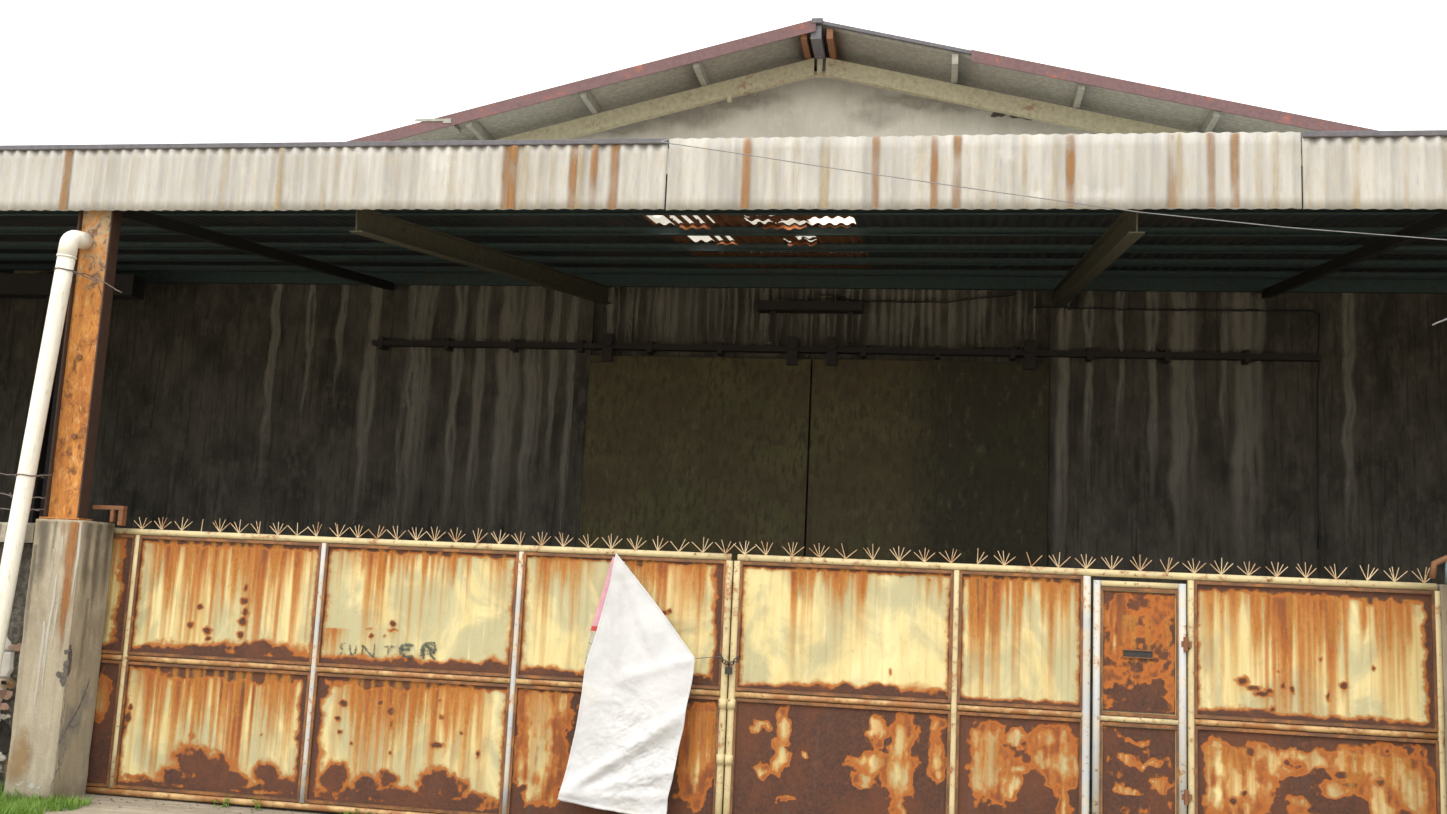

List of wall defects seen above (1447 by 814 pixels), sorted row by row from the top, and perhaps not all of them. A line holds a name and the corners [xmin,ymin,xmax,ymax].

rust [569,145,619,209]
rust [930,142,938,208]
damp [446,286,579,502]
damp [799,289,987,341]
damp [1056,291,1094,517]
damp [1146,291,1197,511]
damp [1219,292,1263,527]
crack [50,679,90,793]
rust [87,537,724,814]
rust [732,565,1081,814]
rust [1102,591,1175,814]
rust [1197,584,1436,814]